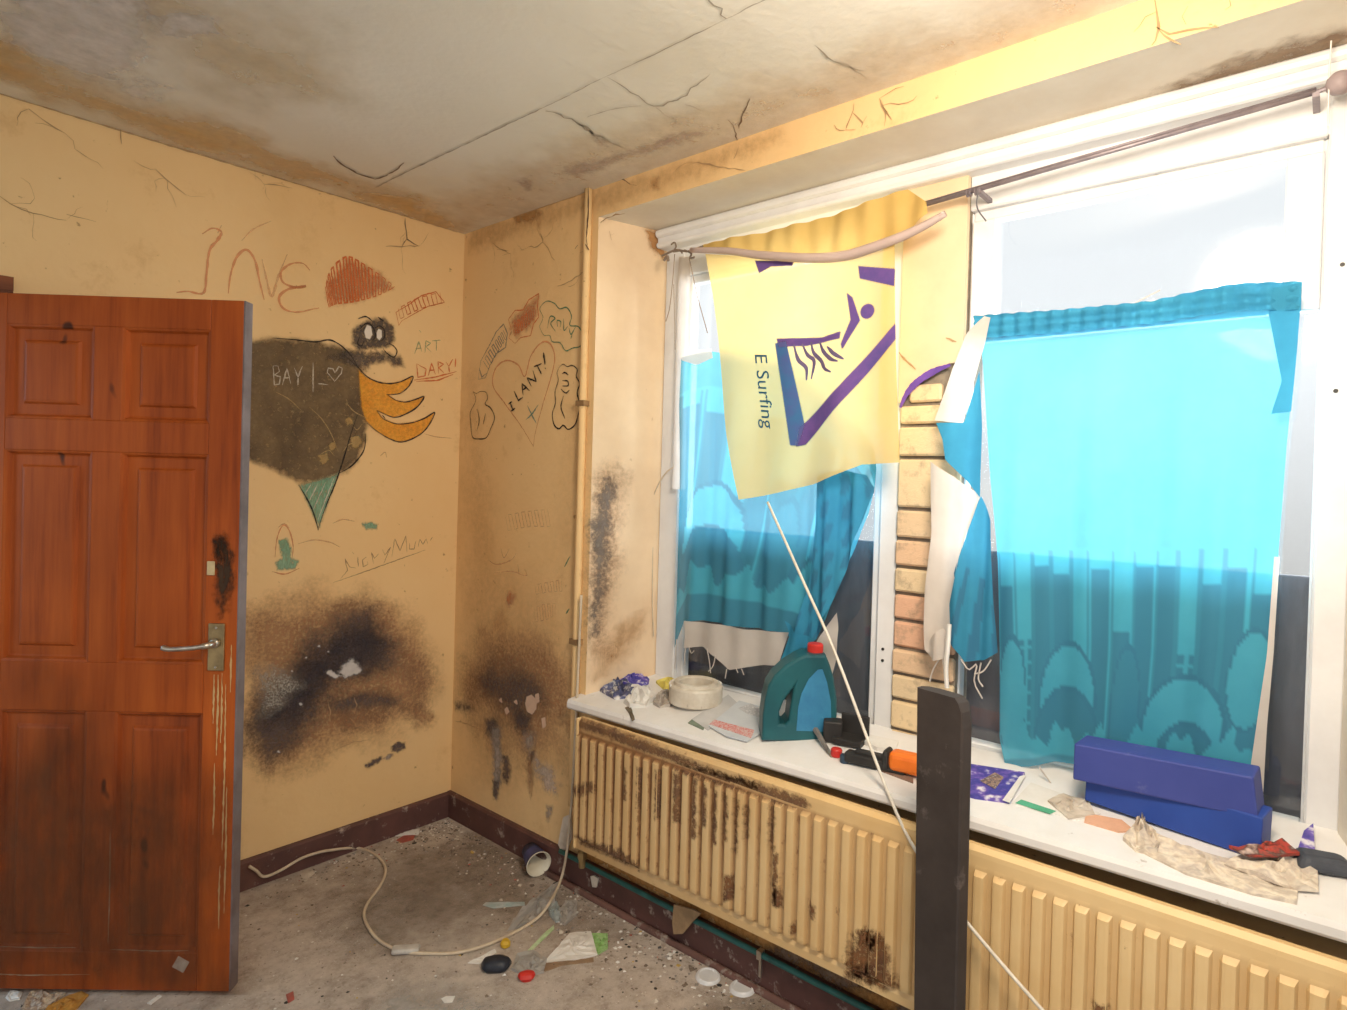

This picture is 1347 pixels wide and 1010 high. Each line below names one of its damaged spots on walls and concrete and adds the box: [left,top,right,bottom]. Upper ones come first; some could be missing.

crack [0,0,764,287]
crack [816,46,916,131]
water stain [591,478,616,635]
corrosion [572,782,596,796]
corrosion [579,720,808,907]
corrosion [579,838,910,1010]